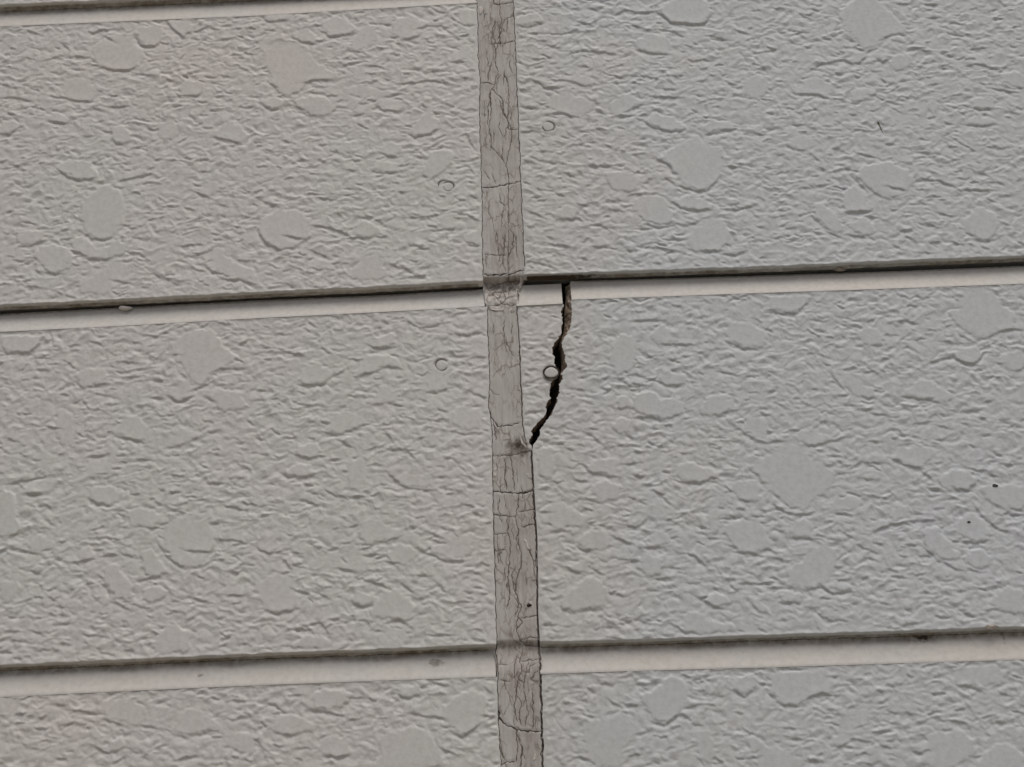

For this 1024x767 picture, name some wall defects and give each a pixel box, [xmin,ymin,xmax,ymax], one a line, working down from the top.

crack [476,0,572,767]